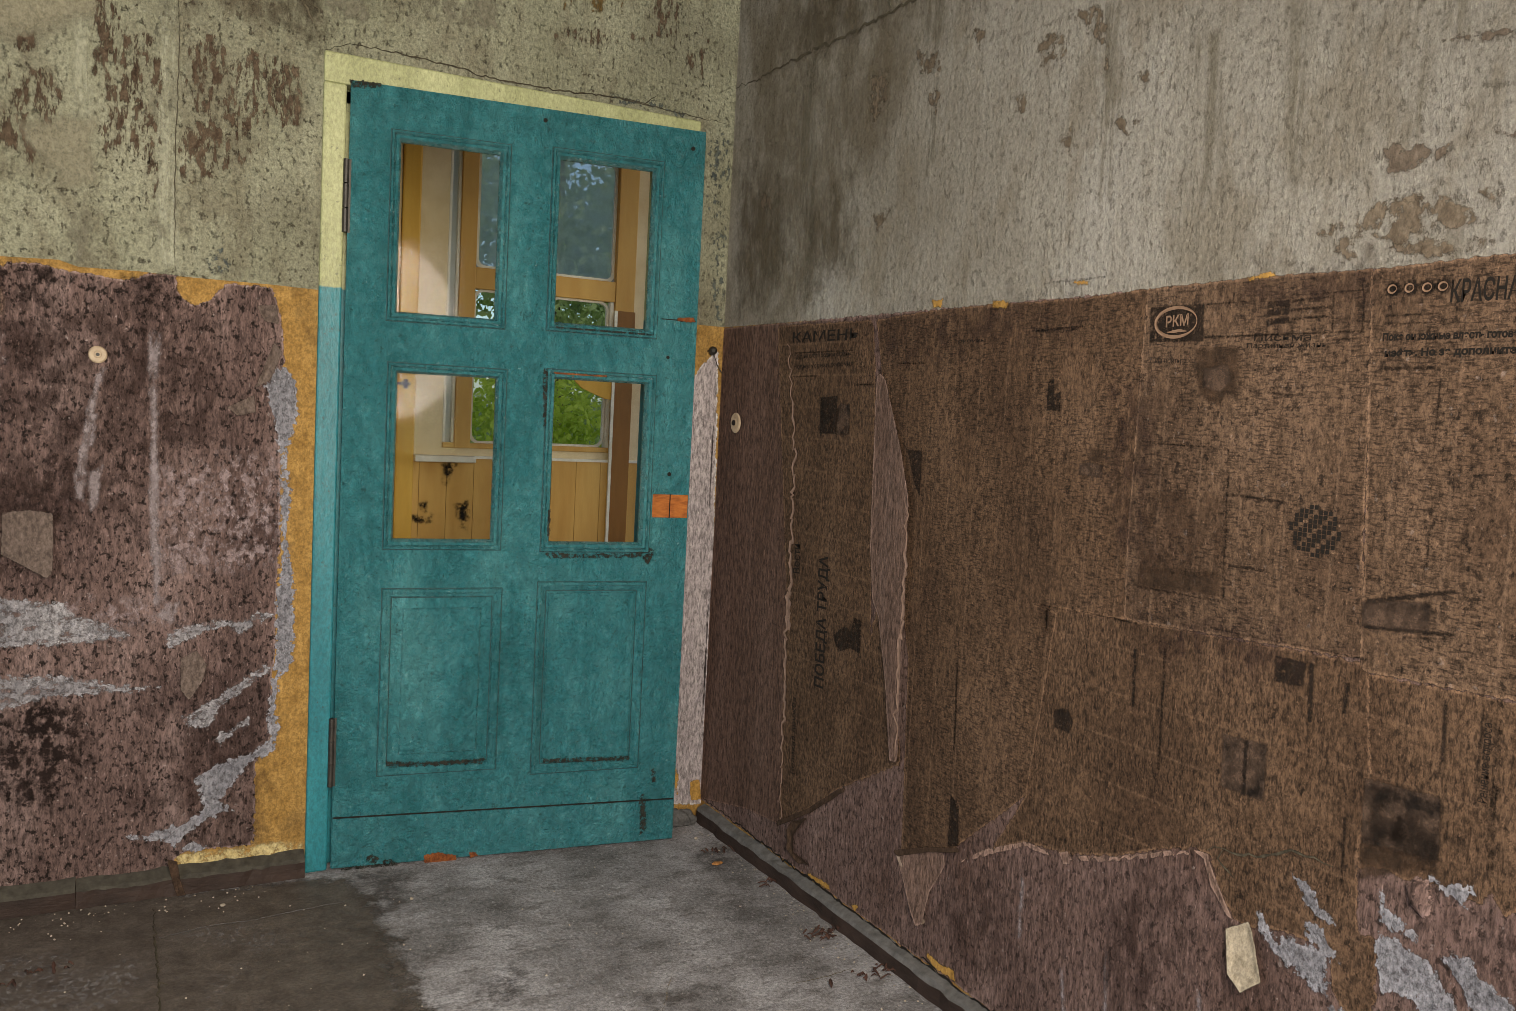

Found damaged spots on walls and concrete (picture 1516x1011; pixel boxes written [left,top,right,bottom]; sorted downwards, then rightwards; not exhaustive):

peeling [0,31,63,163]
crack [173,0,181,253]
peeling [91,0,302,203]
crack [325,43,725,124]
crack [738,0,916,88]
peeling [1316,187,1505,264]
peeling [0,597,130,649]
peeling [122,342,302,864]
peeling [0,674,159,711]
peeling [1256,873,1344,1011]
peeling [1374,889,1515,1011]
peeling [1428,874,1476,910]